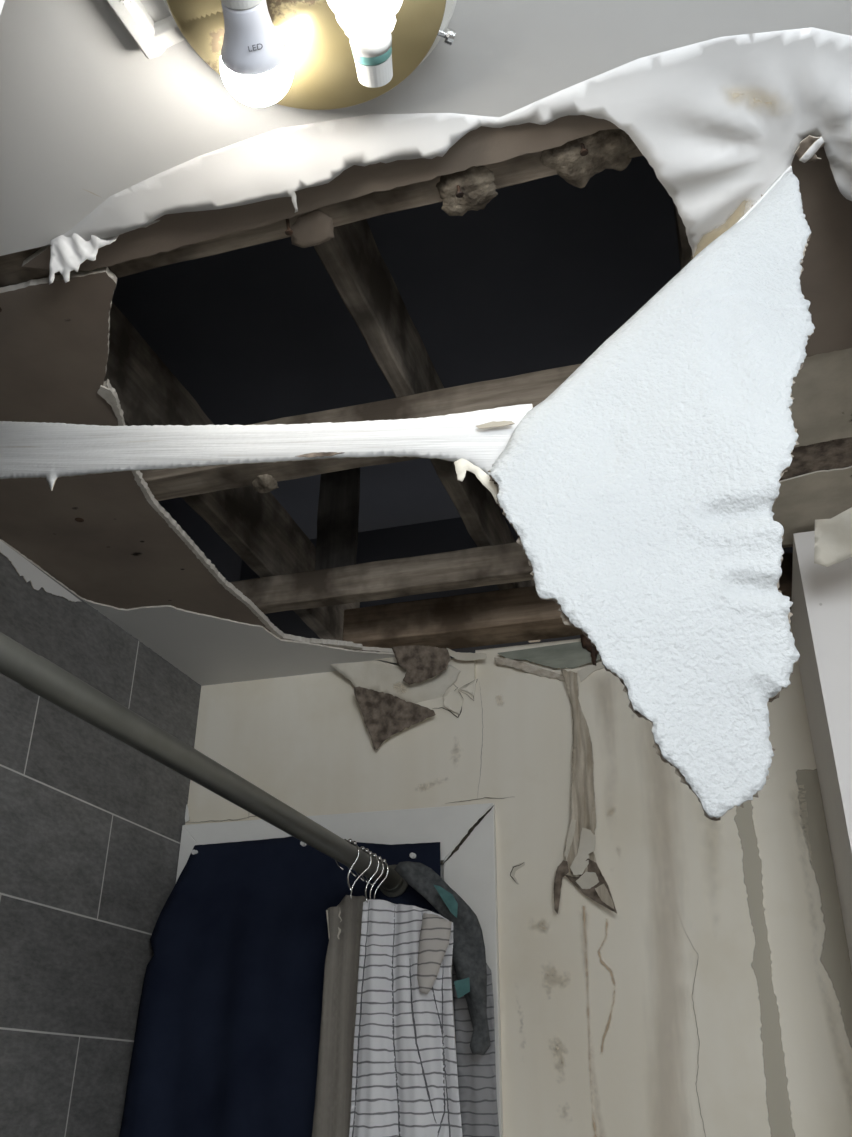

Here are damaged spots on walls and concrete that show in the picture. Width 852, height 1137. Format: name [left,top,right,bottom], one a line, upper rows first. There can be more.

peeling [0,165,815,914]
water stain [734,801,795,1137]
water stain [796,769,852,1047]